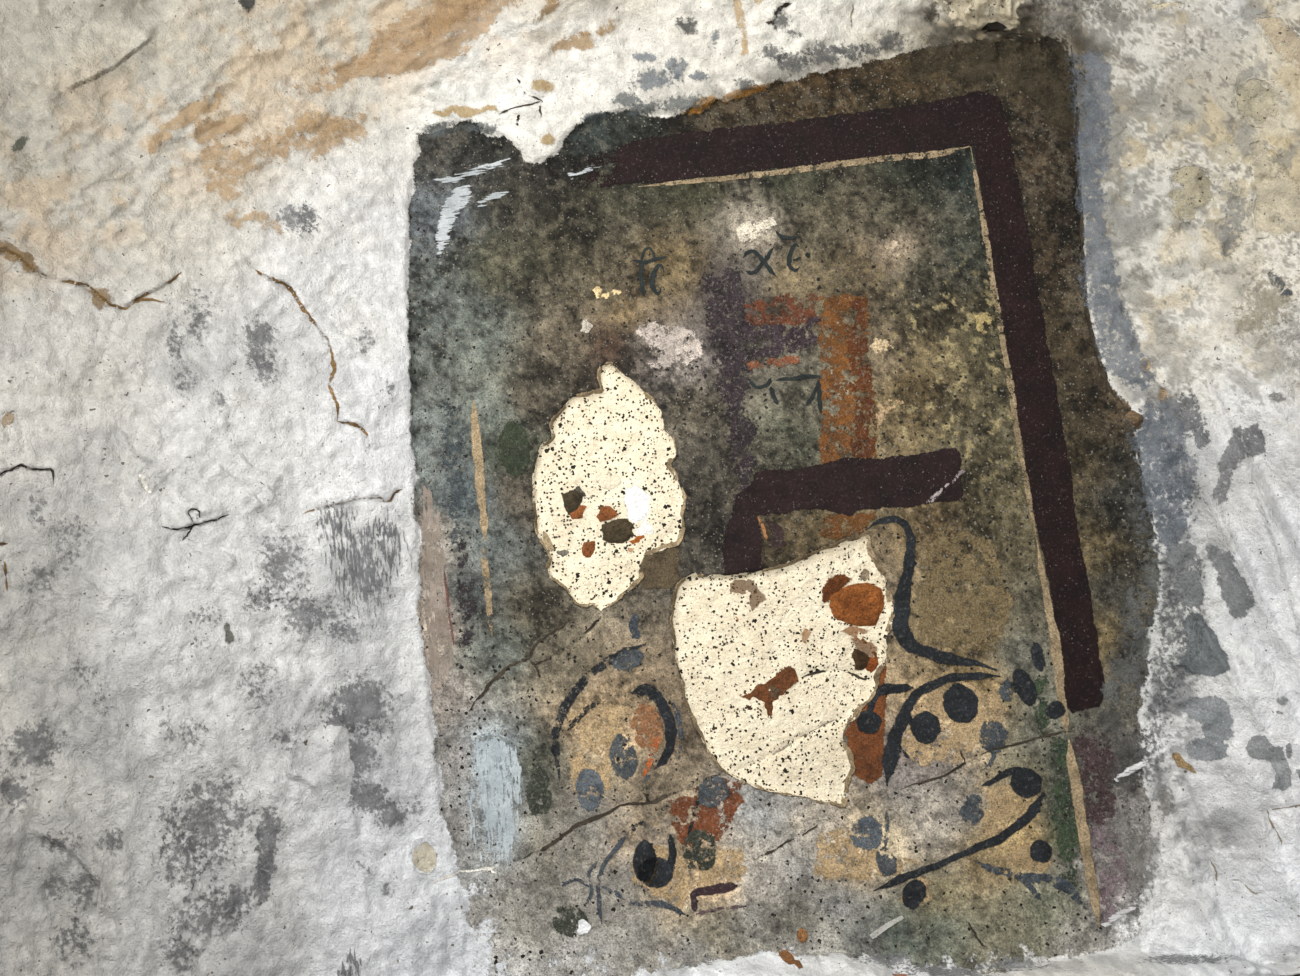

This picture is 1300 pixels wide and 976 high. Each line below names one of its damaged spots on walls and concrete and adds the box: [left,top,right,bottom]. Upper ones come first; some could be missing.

crack [4,250,182,310]
crack [249,262,368,436]
crack [0,464,54,484]
crack [162,508,229,541]
flaking render [532,361,895,808]